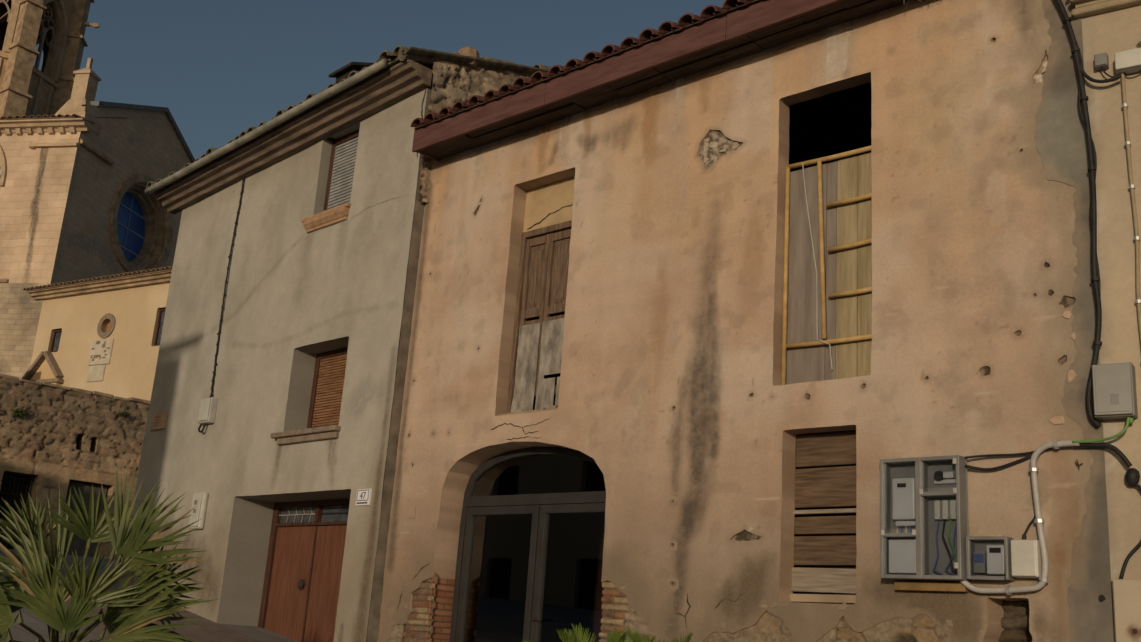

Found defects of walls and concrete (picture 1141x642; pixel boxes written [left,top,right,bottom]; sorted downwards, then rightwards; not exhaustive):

spalling [1033,52,1048,86]
spalling [698,130,743,169]
crack [527,204,573,230]
crack [490,419,548,440]
water stain [689,398,708,507]
spalling [732,527,761,541]
spalling [387,572,455,642]
spalling [599,581,658,642]
spalling [817,603,954,642]